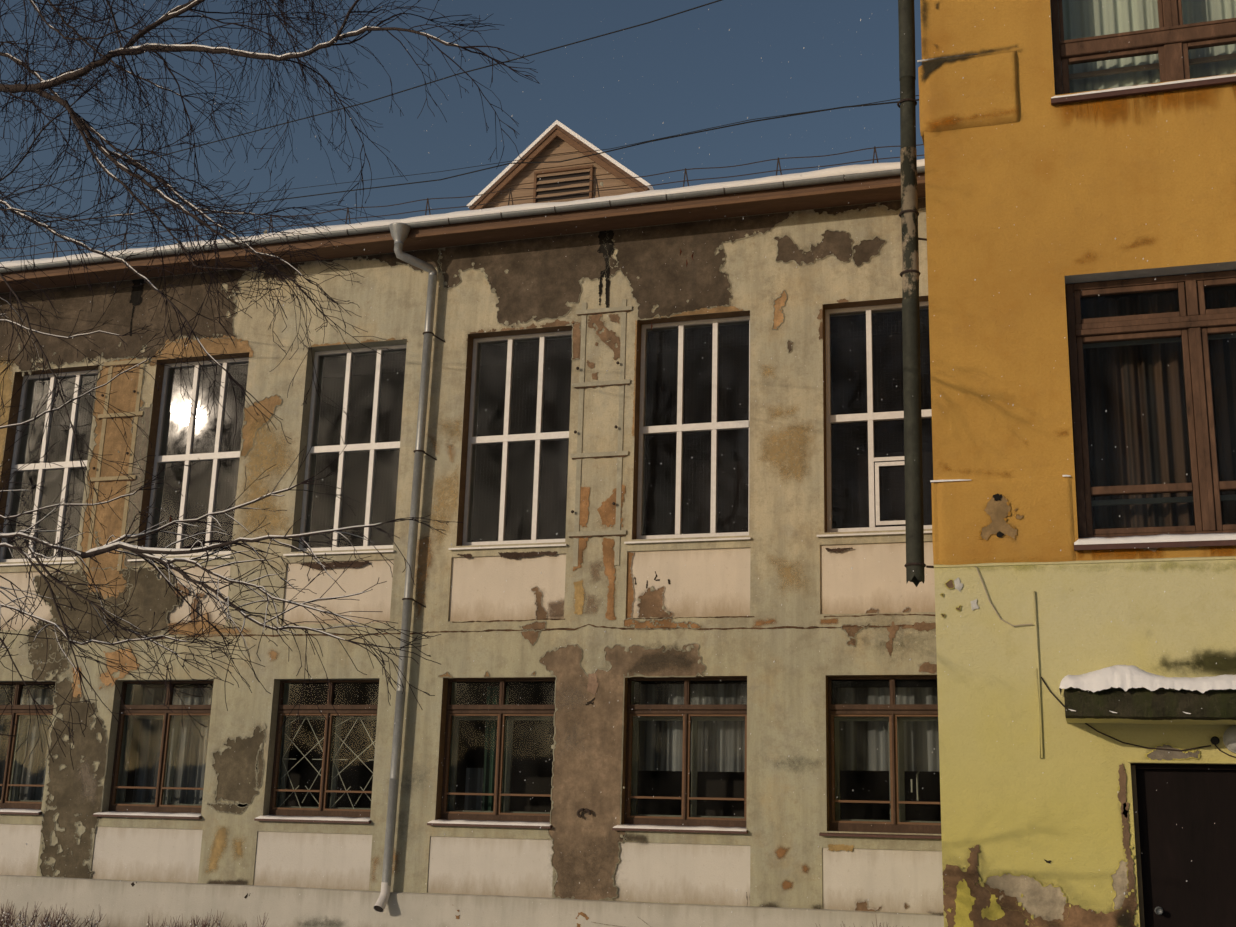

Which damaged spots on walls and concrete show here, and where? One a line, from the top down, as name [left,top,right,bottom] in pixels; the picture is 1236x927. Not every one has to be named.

damp [921,46,1017,81]
damp [597,230,614,308]
flaking render [0,200,901,900]
flaking render [841,577,979,656]
spalling [943,763,1138,927]